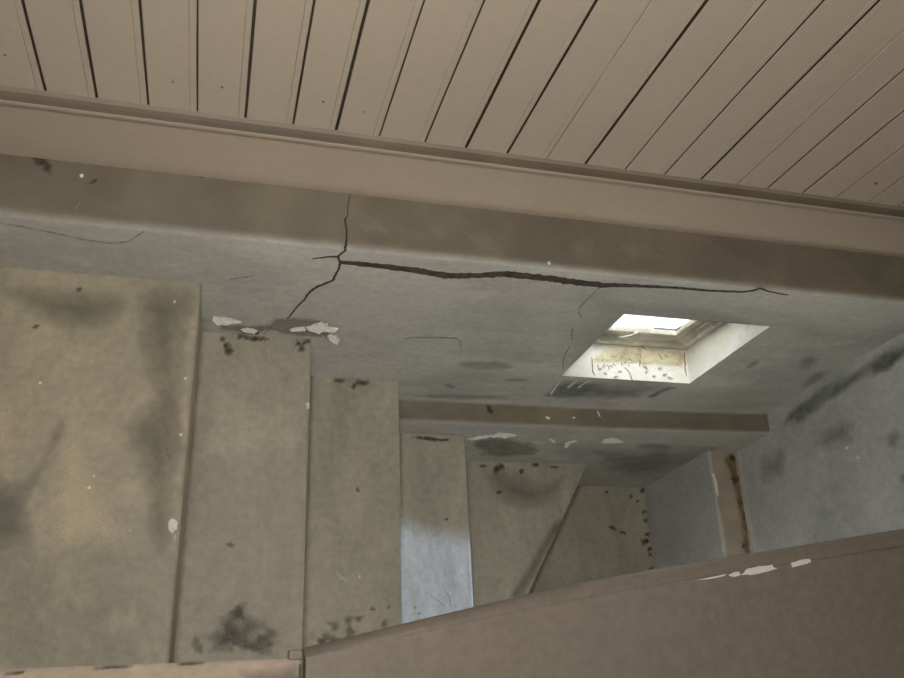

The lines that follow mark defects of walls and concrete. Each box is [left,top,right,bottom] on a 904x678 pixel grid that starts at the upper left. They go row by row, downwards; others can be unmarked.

crack [0,222,145,244]
crack [286,194,788,374]
spalling [212,316,340,345]
peeling [468,432,533,455]
peeling [700,565,777,580]